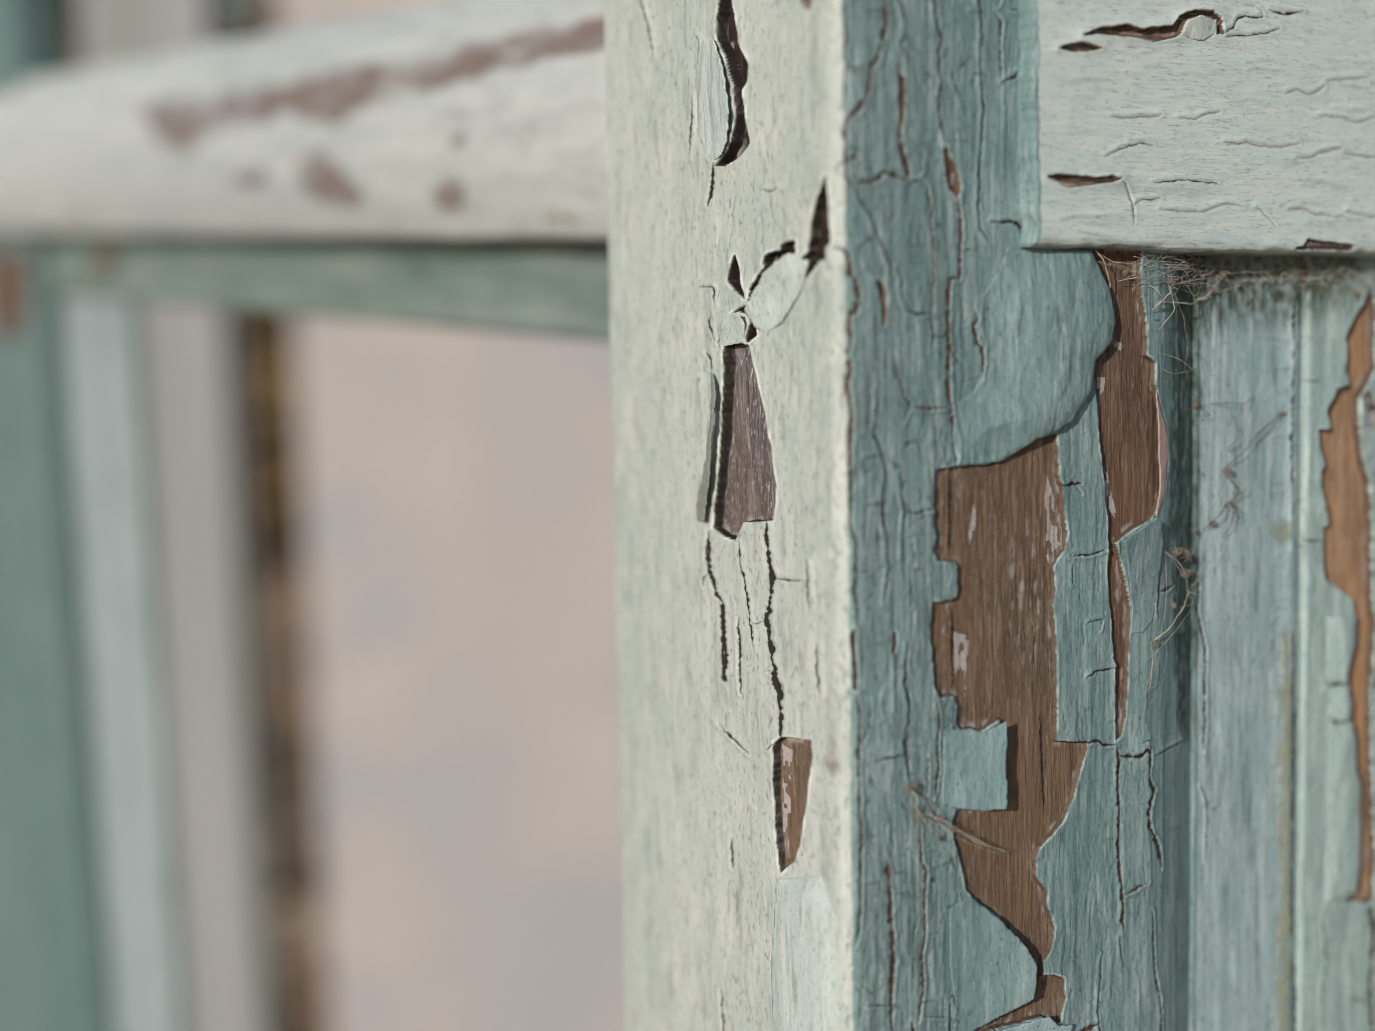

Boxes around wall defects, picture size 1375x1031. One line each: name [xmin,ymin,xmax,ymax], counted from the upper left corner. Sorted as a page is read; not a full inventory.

peeling [696,9,750,164]
crack [702,522,809,753]
peeling [718,196,830,536]
peeling [780,738,812,867]
crack [857,606,955,1031]
crack [834,0,1021,619]
peeling [930,436,1083,1031]
crack [1039,586,1206,1031]
peeling [1087,249,1169,736]
crack [1110,77,1375,224]
crack [1224,10,1302,37]
peeling [1318,297,1375,905]